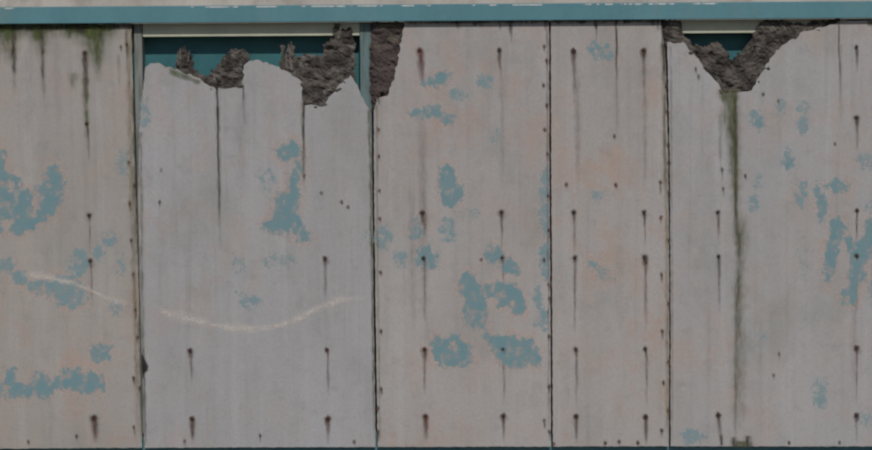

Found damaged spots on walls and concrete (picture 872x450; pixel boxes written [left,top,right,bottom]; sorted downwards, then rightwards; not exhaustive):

peeling [0,149,67,236]
peeling [259,135,311,243]
peeling [0,232,117,312]
peeling [374,216,439,270]
peeling [429,163,550,369]
peeling [794,178,872,307]
peeling [0,343,113,402]